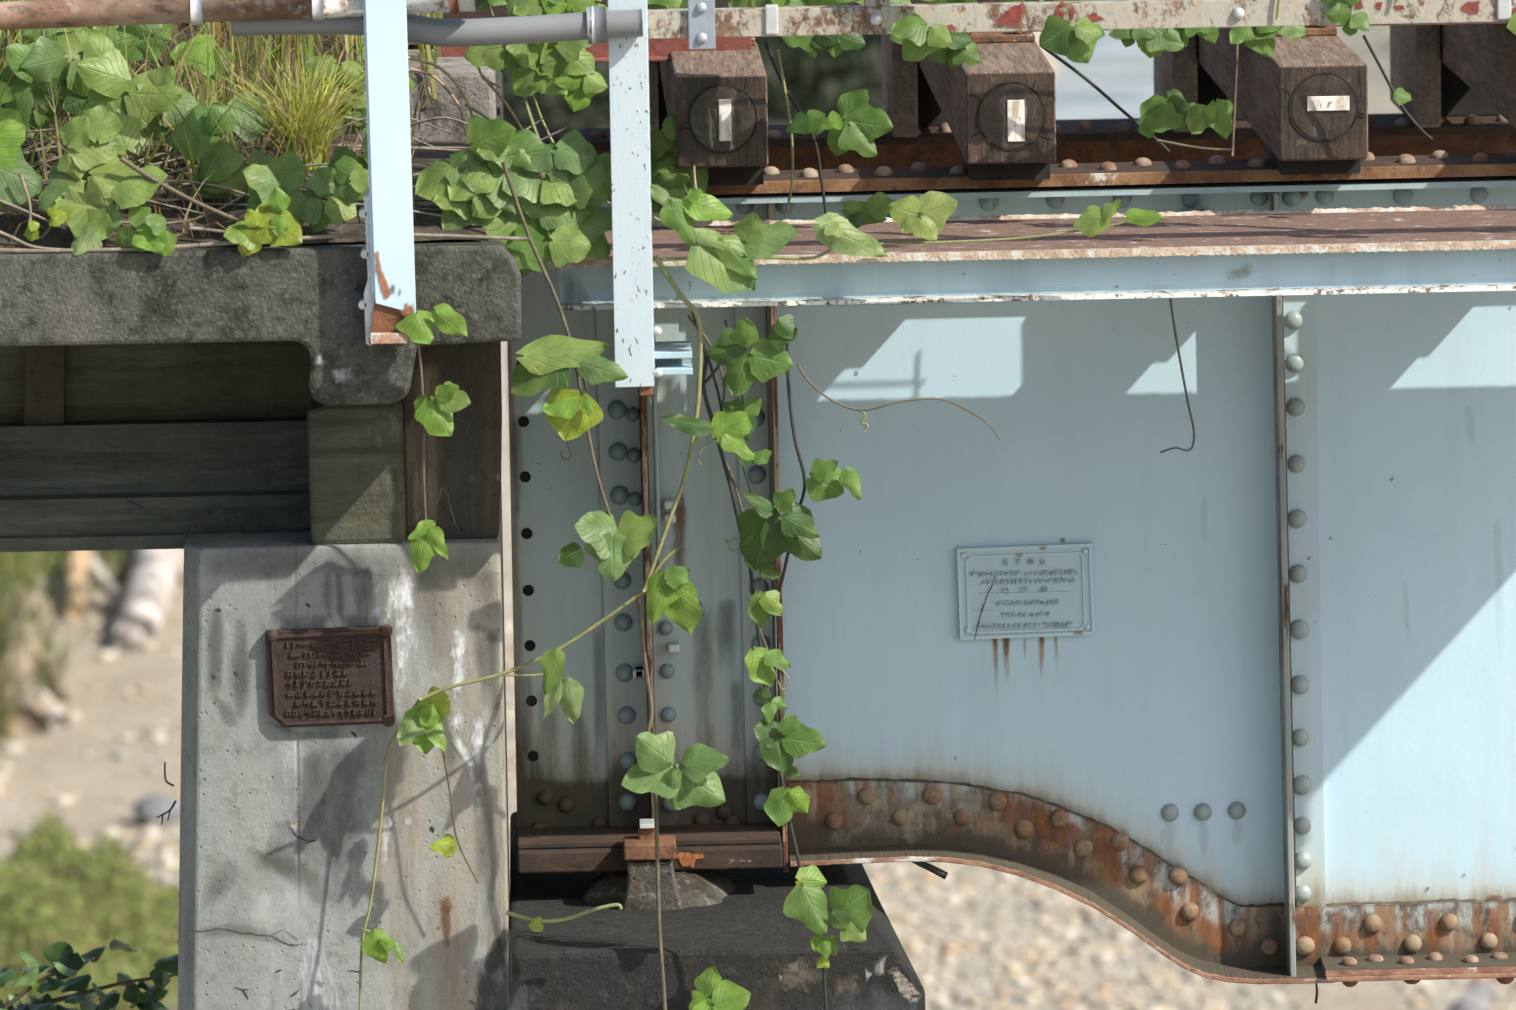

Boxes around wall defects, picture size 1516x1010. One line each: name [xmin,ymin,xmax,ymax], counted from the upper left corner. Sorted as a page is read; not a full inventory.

peeling [1054,1,1104,22]
peeling [1355,1,1405,11]
peeling [1460,1,1481,14]
rust [375,252,414,315]
damp [387,576,412,679]
damp [452,633,464,691]
rust [993,637,1057,666]
damp [448,715,483,810]
damp [382,817,412,863]
rust [677,851,704,868]
rust [441,898,452,943]
rust [1304,907,1344,954]